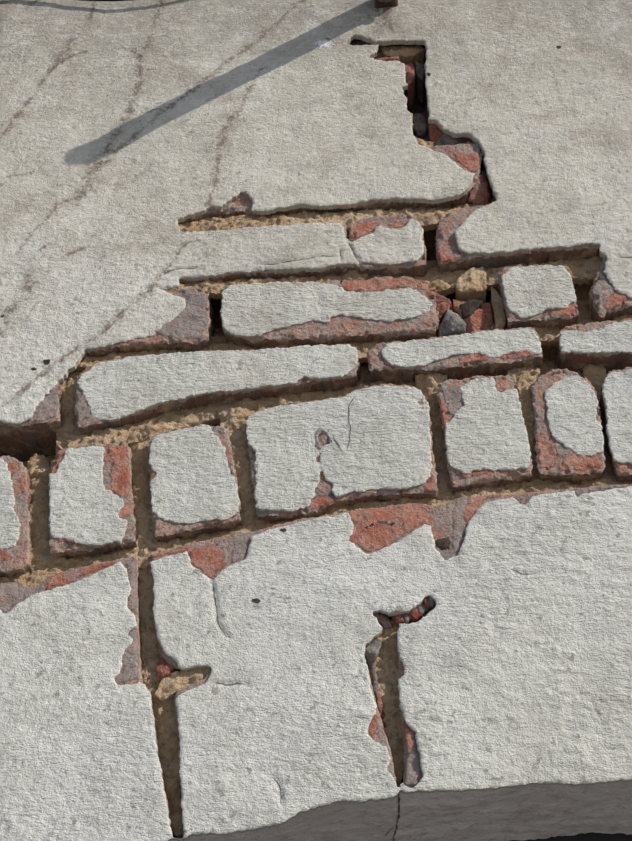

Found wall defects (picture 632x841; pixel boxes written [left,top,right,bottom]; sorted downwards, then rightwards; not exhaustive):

rust [374,0,398,27]
crack [261,243,360,265]
peeling [338,277,436,299]
peeling [155,289,209,339]
peeling [309,427,337,509]
peeling [536,432,603,473]
peeling [348,494,501,553]
peeling [151,534,250,579]
peeling [0,583,26,613]
crack [130,534,242,838]
crack [364,597,436,841]
peeling [403,720,422,787]